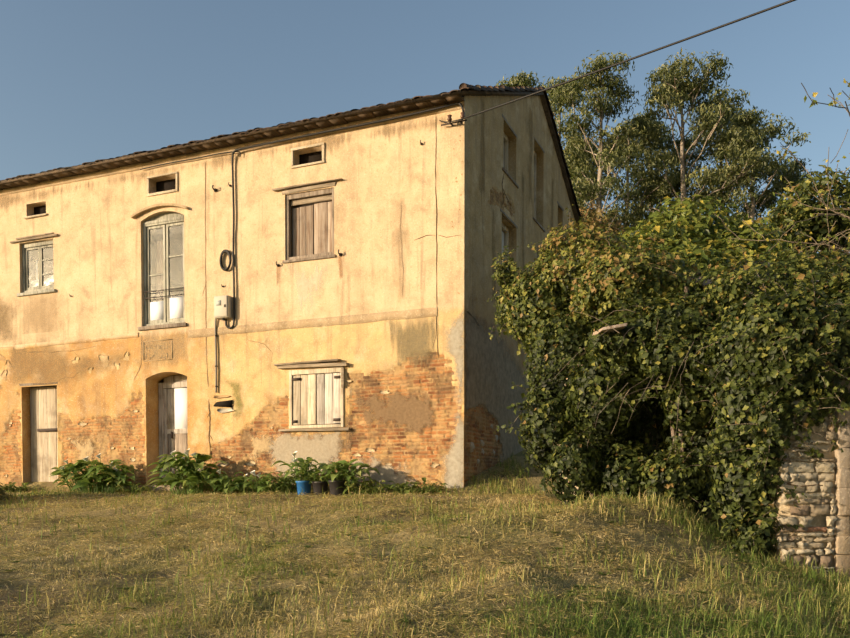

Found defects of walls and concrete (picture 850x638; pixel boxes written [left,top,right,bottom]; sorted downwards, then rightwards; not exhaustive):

crack [400,121,458,360]
leakage [390,324,434,362]
flaking render [0,405,22,486]
flaking render [59,392,146,486]
flaking render [206,352,502,488]